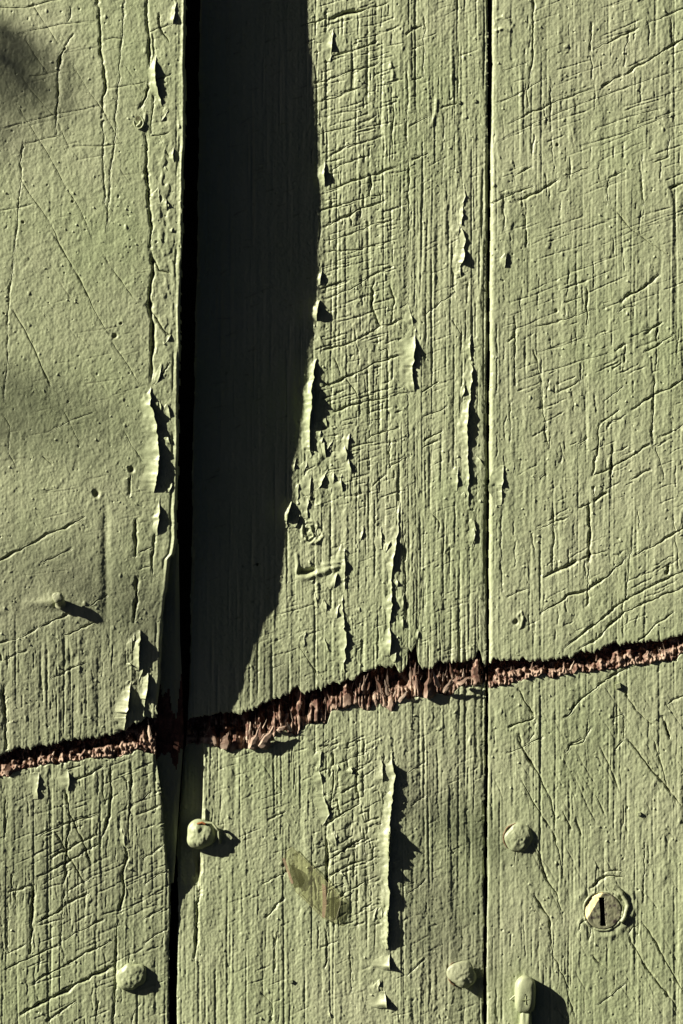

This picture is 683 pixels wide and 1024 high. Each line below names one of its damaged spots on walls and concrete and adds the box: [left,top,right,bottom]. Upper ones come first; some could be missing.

peeling [316,161,325,187]
peeling [306,300,320,321]
peeling [396,304,416,391]
peeling [128,364,172,536]
peeling [280,359,351,528]
peeling [294,501,404,672]
crack [0,594,108,750]
peeling [105,630,157,730]
crack [270,601,325,680]
crack [411,795,427,806]
peeling [363,751,396,1009]
crack [407,958,426,977]